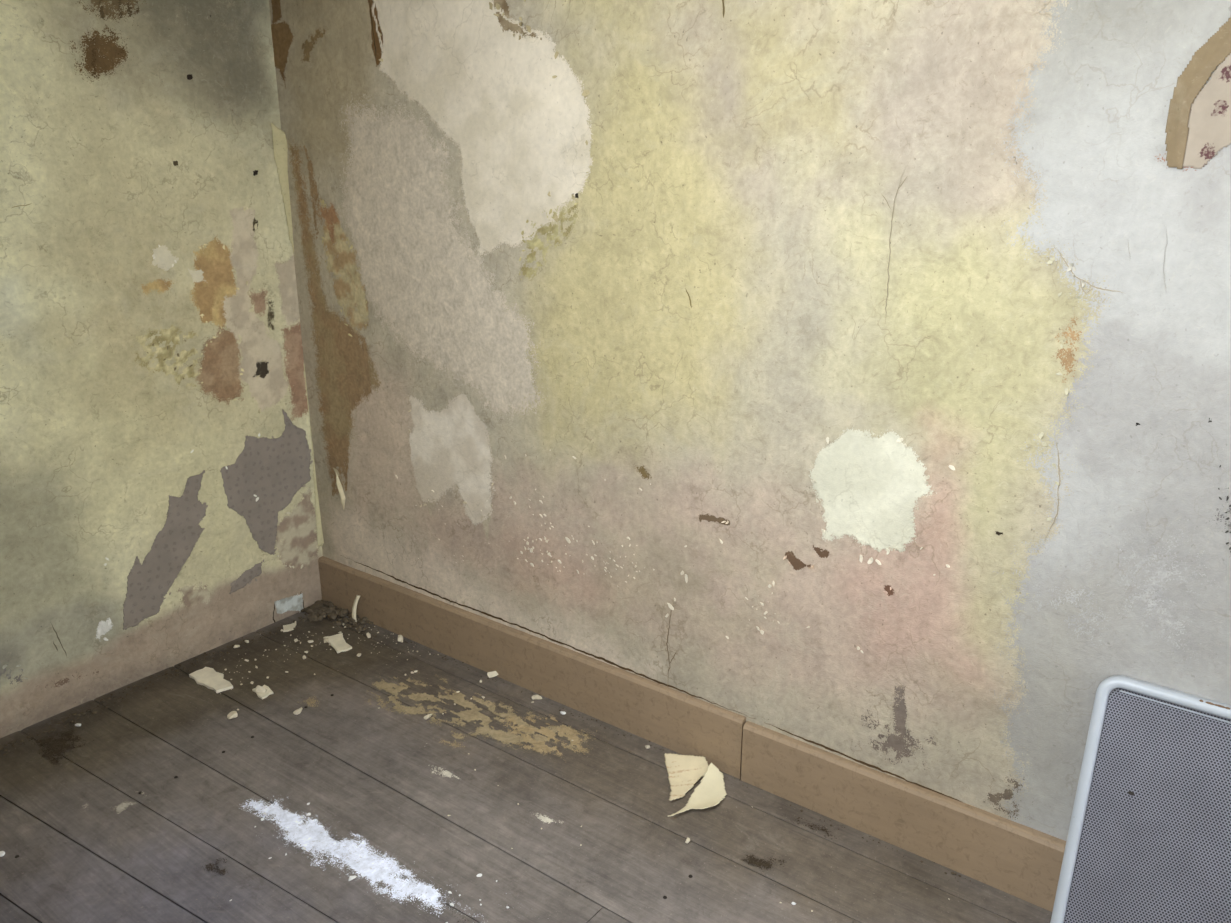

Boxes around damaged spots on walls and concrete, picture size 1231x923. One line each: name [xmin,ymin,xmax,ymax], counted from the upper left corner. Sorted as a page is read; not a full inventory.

damp [69,0,147,83]
damp [168,0,325,89]
rust [319,203,340,242]
flaking render [320,0,655,583]
flaking render [131,123,324,571]
flaking render [986,0,1231,841]
flaking render [783,427,937,571]
flaking render [169,583,211,611]
flaking render [273,592,305,623]
damp [993,487,1231,670]
damp [859,685,937,768]